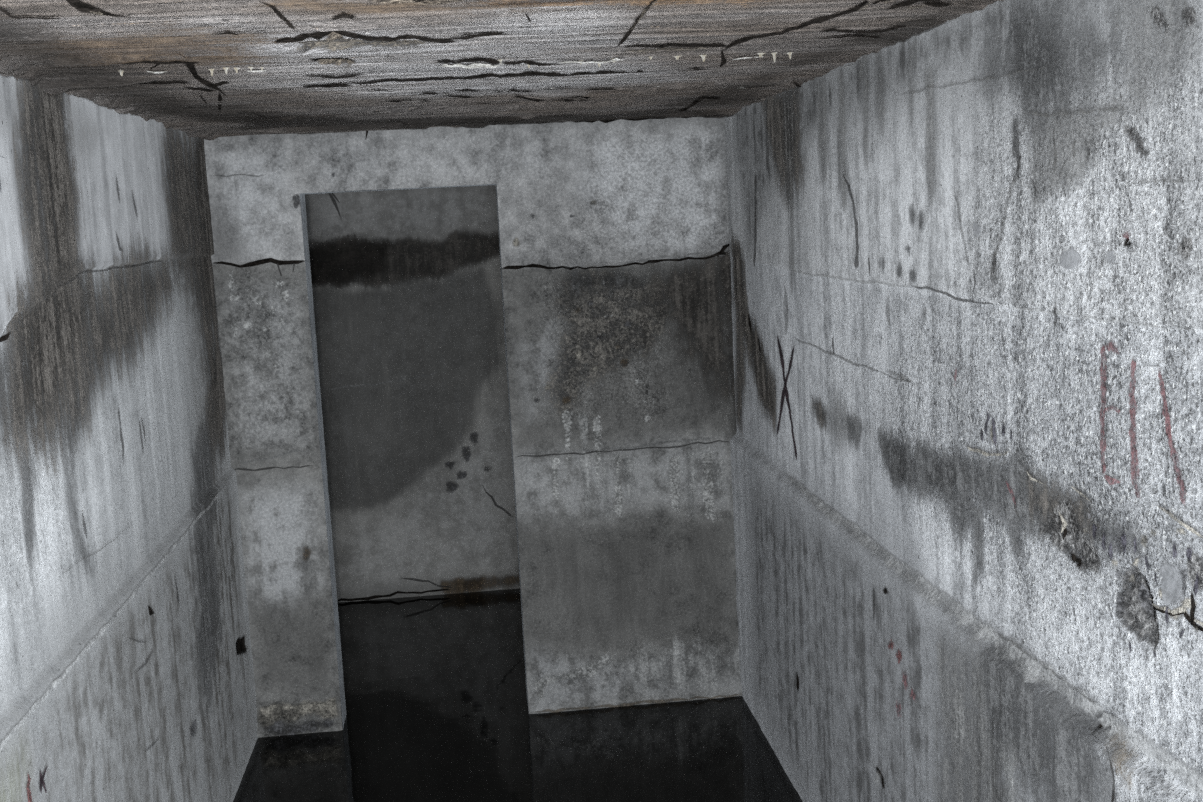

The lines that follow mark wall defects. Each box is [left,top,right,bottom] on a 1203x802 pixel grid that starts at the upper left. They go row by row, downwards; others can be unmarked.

crack [0,0,127,20]
crack [125,61,229,116]
crack [218,0,952,124]
damp [733,16,941,206]
crack [214,258,304,275]
damp [0,17,804,750]
damp [812,401,861,448]
peeling [967,411,1012,456]
crack [486,492,511,516]
damp [880,433,1140,581]
crack [337,578,451,602]
spalling [1039,486,1203,657]